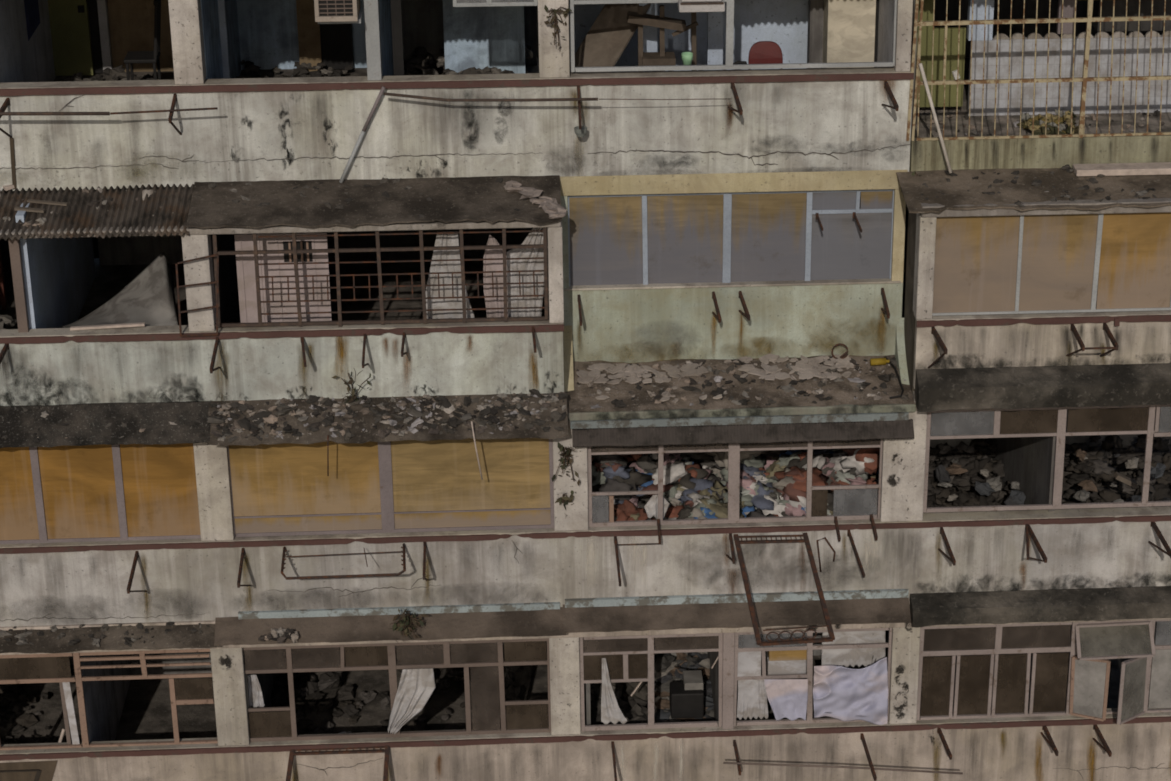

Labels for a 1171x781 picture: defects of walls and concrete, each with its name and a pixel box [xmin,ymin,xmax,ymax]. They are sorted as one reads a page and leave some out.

water stain [279,111,293,164]
crack [588,144,910,166]
water stain [0,353,82,407]
water stain [161,381,203,403]
water stain [1124,575,1171,588]